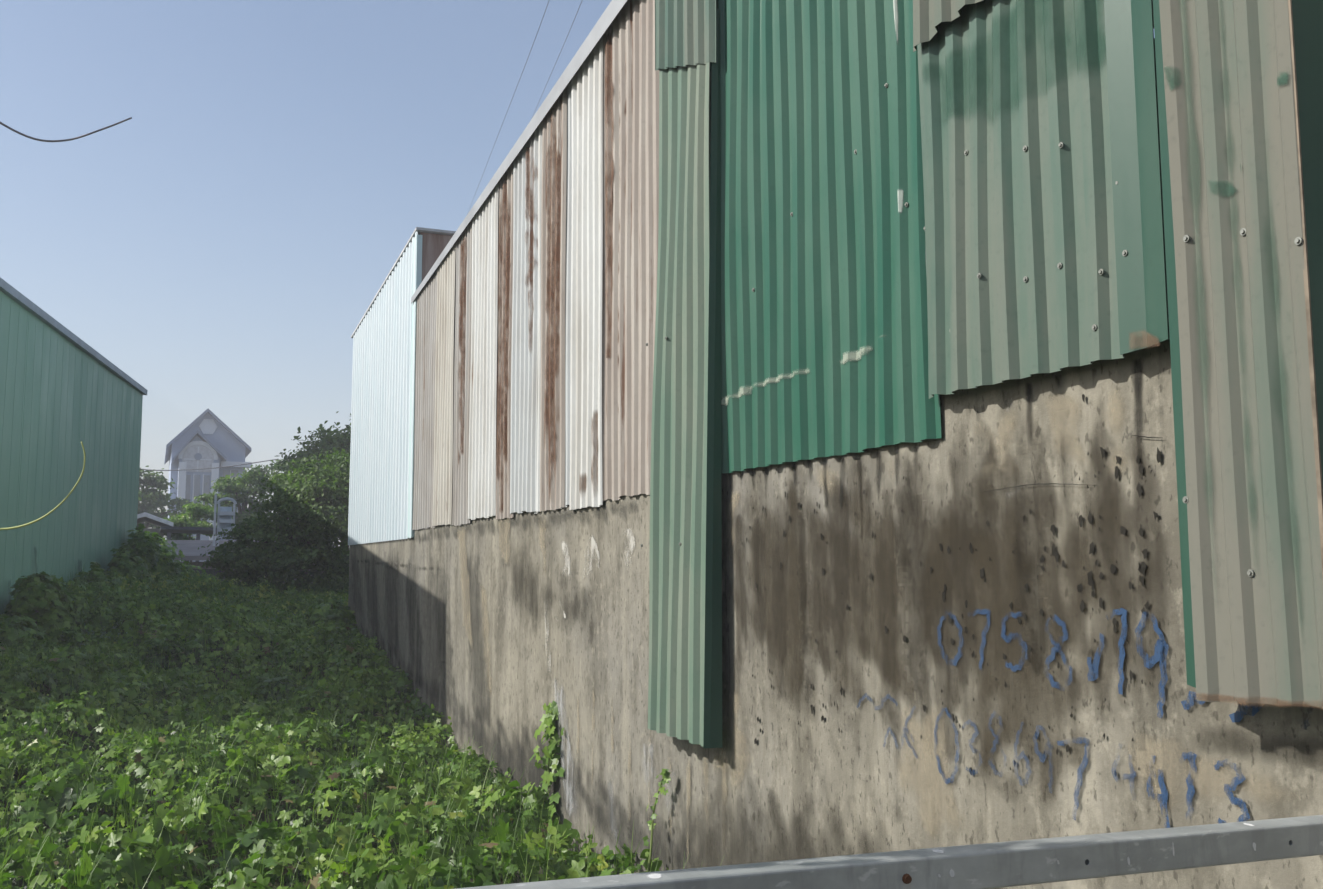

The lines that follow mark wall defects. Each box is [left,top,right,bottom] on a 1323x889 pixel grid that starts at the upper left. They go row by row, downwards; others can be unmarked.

rust [605,36,626,136]
rust [605,154,626,289]
rust [496,110,561,511]
rust [606,306,619,361]
rust [579,412,598,490]
water stain [1079,360,1161,497]
water stain [455,514,841,869]
water stain [734,452,1158,830]
water stain [1132,738,1163,799]